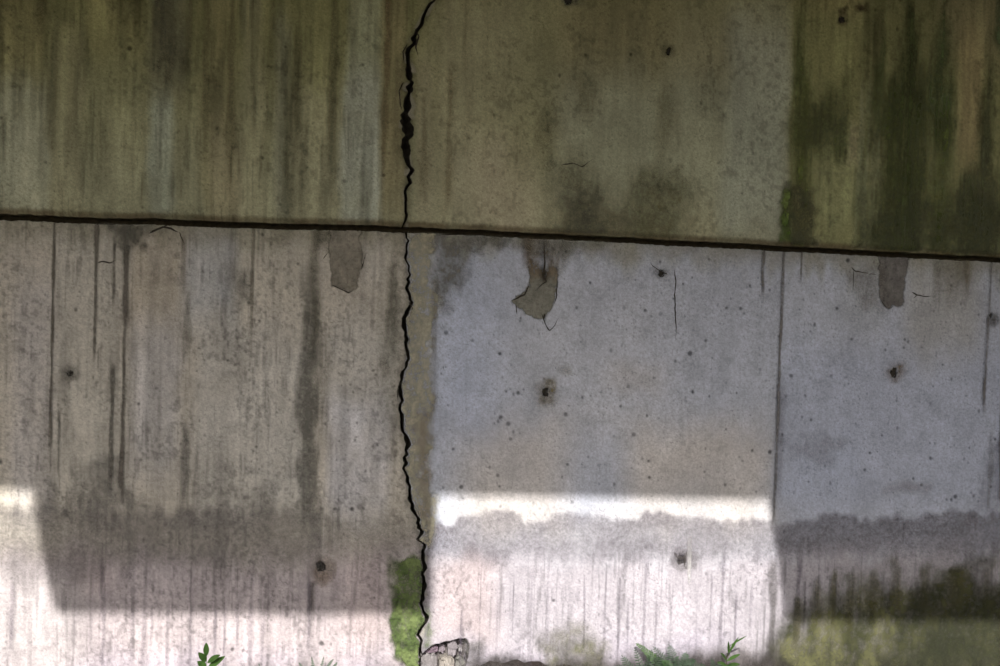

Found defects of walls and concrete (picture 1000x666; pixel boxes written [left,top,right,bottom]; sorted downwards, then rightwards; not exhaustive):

peeling [320,230,366,293]
peeling [512,238,558,331]
peeling [878,256,909,309]
crack [397,0,436,666]
water stain [388,233,527,552]
water stain [597,252,1000,553]
water stain [480,656,528,666]
water stain [639,655,725,666]
water stain [750,565,785,666]